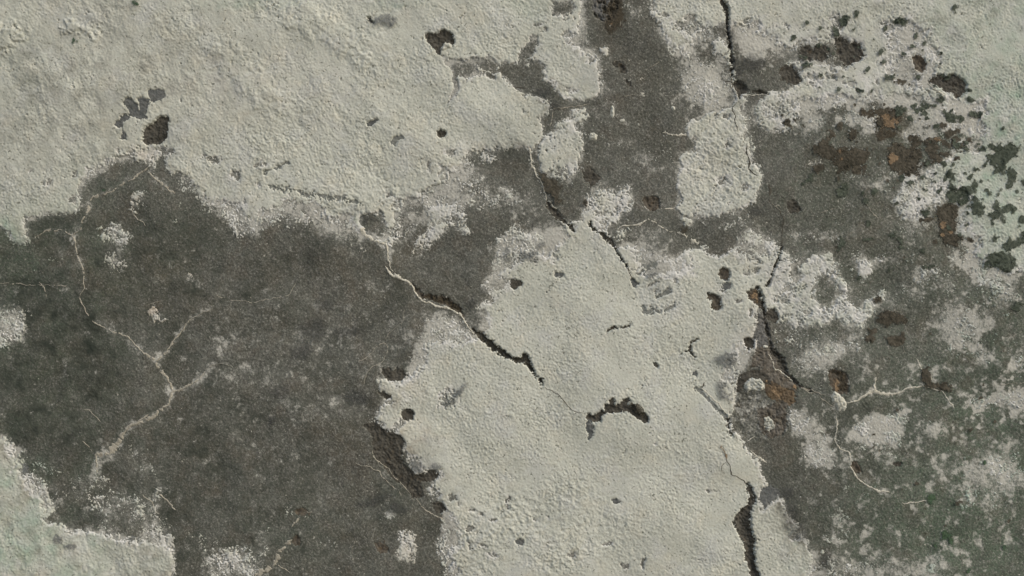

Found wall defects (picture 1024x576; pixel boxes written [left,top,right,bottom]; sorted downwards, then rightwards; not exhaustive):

spalling [425,29,454,56]
damp [798,6,859,88]
spalling [143,116,169,149]
corrosion [859,106,902,165]
damp [801,17,1024,273]
crack [263,161,582,413]
crack [528,147,699,279]
crack [720,0,964,504]
damp [865,295,908,347]
spalling [364,409,442,498]
spalling [586,398,655,444]
crack [694,383,767,576]